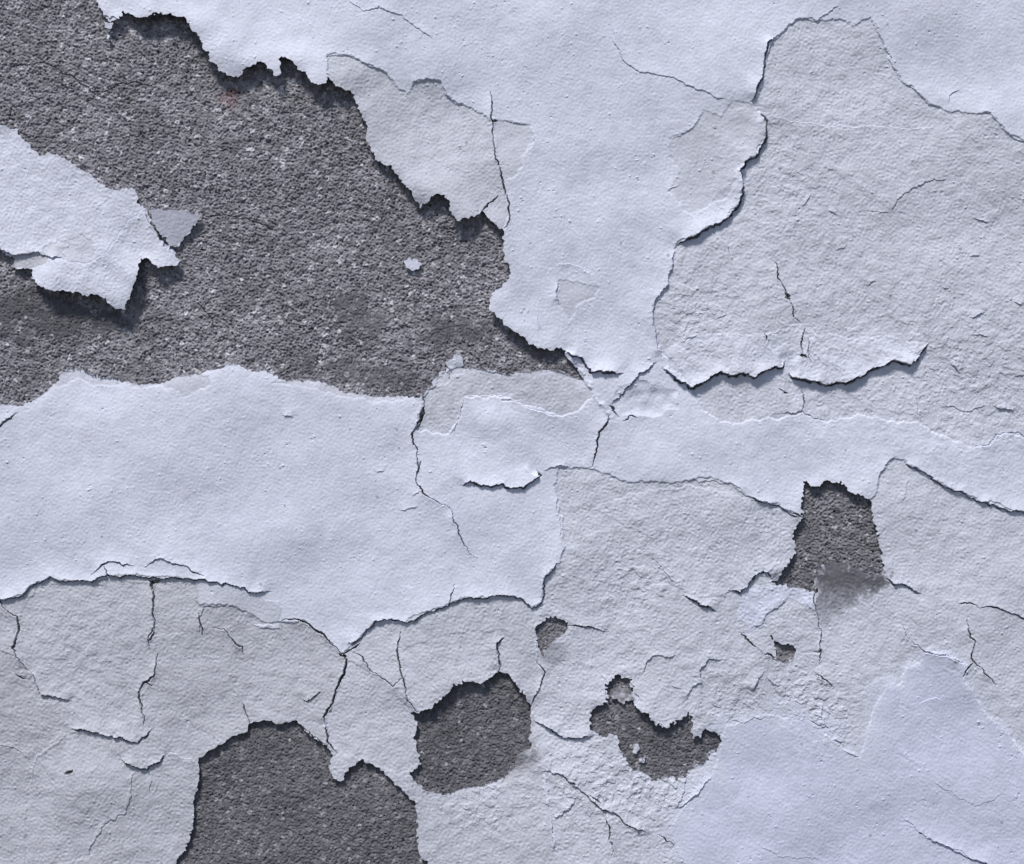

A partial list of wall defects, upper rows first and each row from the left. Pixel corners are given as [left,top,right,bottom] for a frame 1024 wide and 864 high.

crack [483,156,511,221]
peeling [0,0,1024,456]
crack [411,396,439,503]
crack [594,406,635,459]
crack [0,600,27,679]
crack [138,674,155,709]
crack [100,562,200,639]
crack [288,618,416,749]
peeling [0,458,1024,864]
crack [741,634,775,660]
crack [913,602,1024,684]
crack [566,778,638,840]